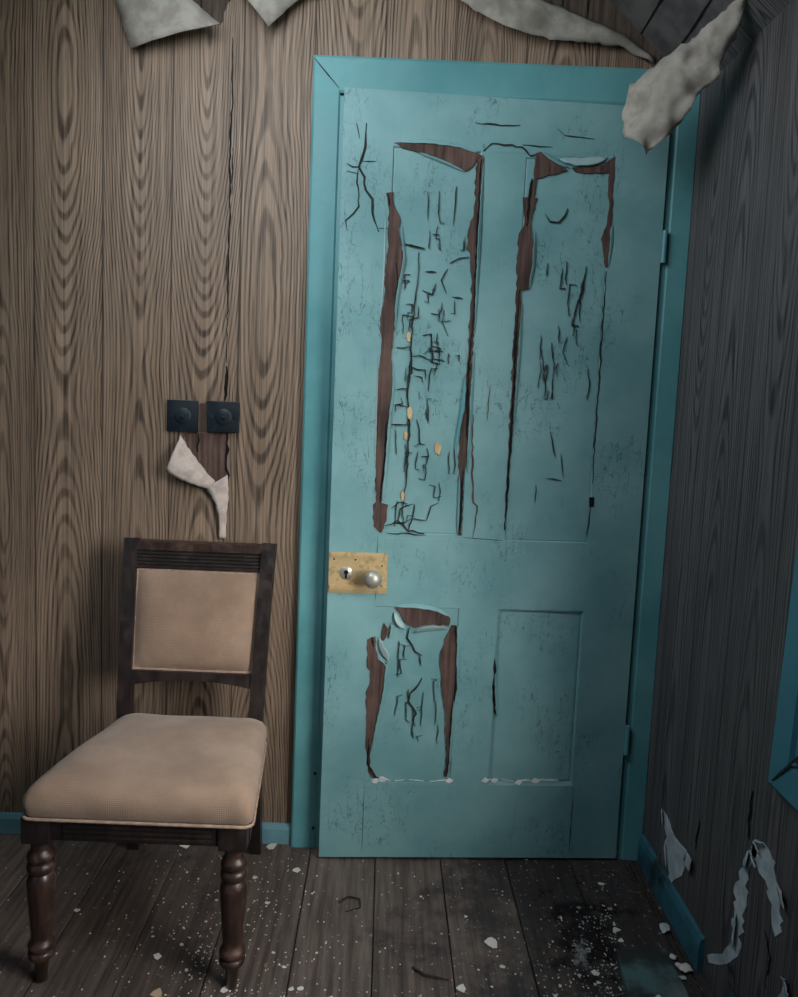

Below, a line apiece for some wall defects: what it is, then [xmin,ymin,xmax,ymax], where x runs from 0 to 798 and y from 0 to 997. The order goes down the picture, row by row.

peeling [372,192,406,533]
peeling [395,139,484,536]
peeling [505,149,615,528]
peeling [365,603,462,783]
peeling [661,809,691,883]
peeling [707,839,785,965]